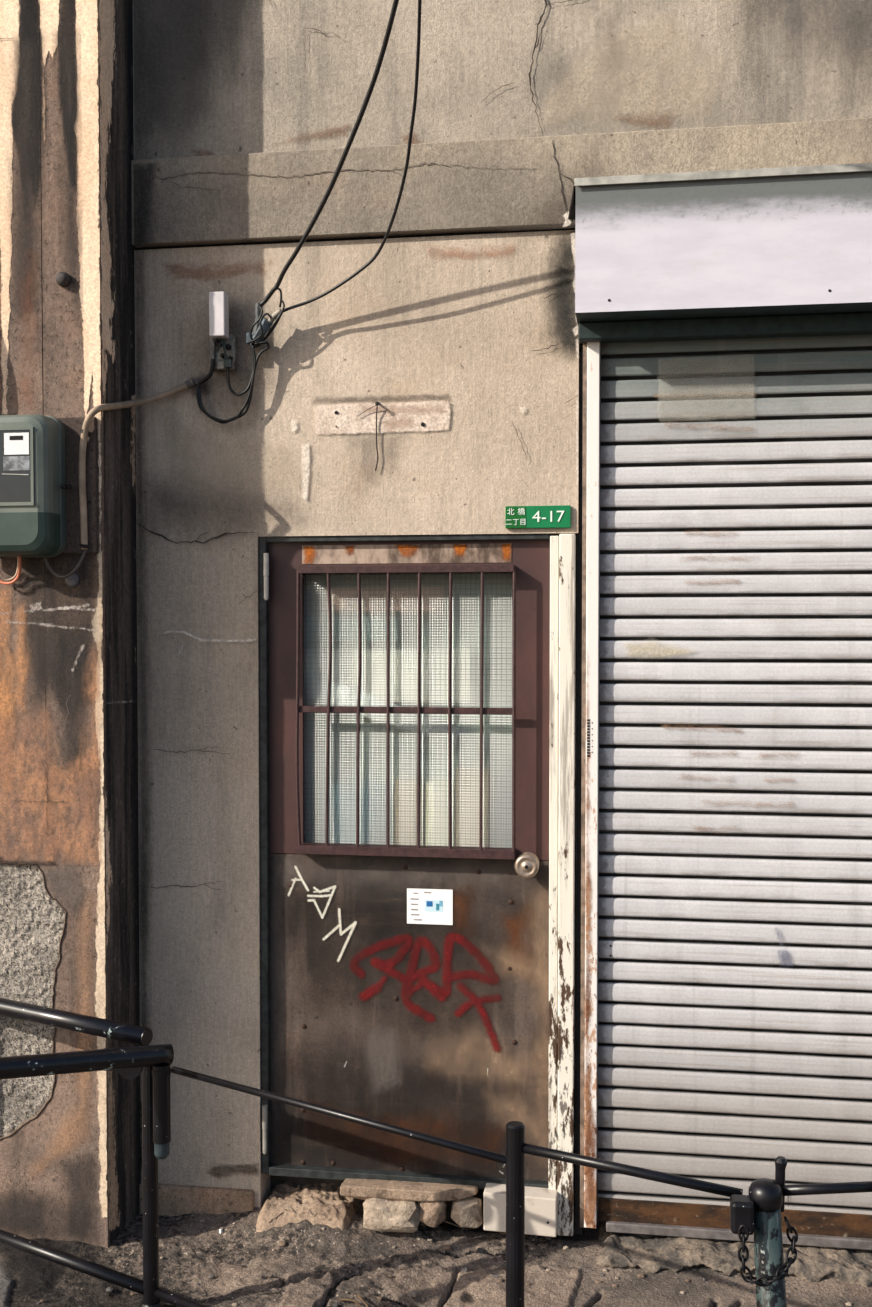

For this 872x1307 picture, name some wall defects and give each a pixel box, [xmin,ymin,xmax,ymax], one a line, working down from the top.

crack [135,0,574,214]
damp [12,0,42,310]
damp [58,0,78,295]
crack [139,524,254,544]
rust [304,546,315,563]
rust [398,545,418,556]
rust [502,544,511,560]
rust [0,591,97,861]
spalling [0,861,67,1009]
spalling [0,1015,57,1057]
spalling [0,1075,56,1140]
crack [324,1248,505,1307]